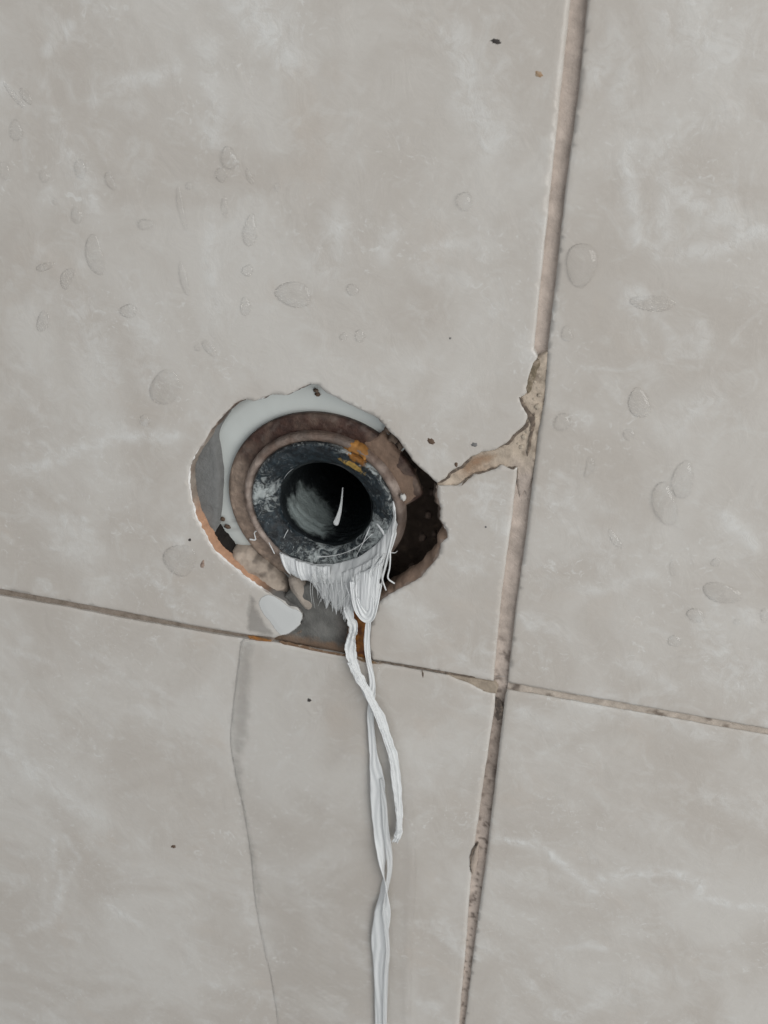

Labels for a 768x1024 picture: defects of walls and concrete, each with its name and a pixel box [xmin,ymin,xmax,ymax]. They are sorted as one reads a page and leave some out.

spalling [188,384,349,653]
corrosion [343,440,368,460]
spalling [364,419,448,602]
crack [437,350,548,499]